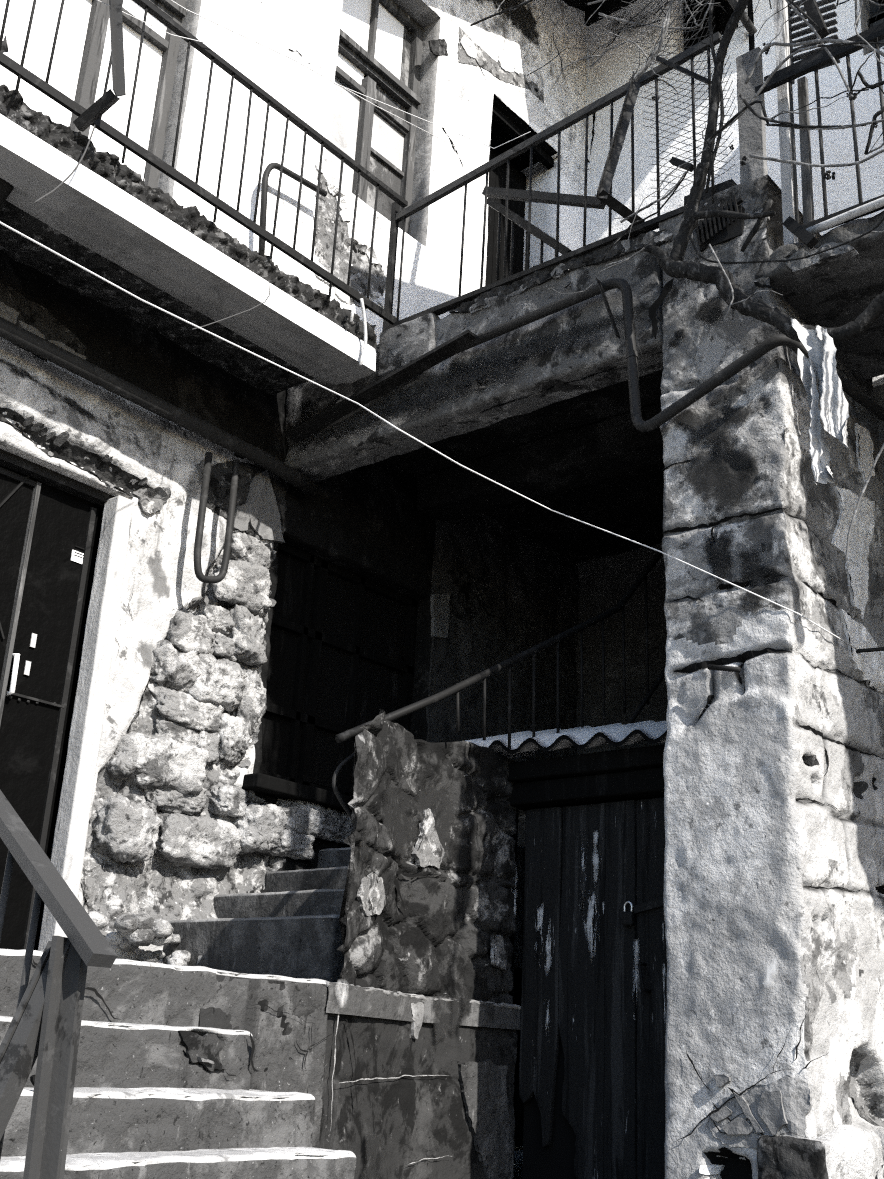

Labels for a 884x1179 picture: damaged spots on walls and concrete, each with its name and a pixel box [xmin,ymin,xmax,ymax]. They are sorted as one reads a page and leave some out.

flaking render [428,26,544,103]
spalling [0,407,171,515]
water stain [674,396,771,511]
water stain [705,533,780,613]
spalling [178,1030,226,1071]
crack [677,1011,829,1141]
spalling [699,1147,753,1179]